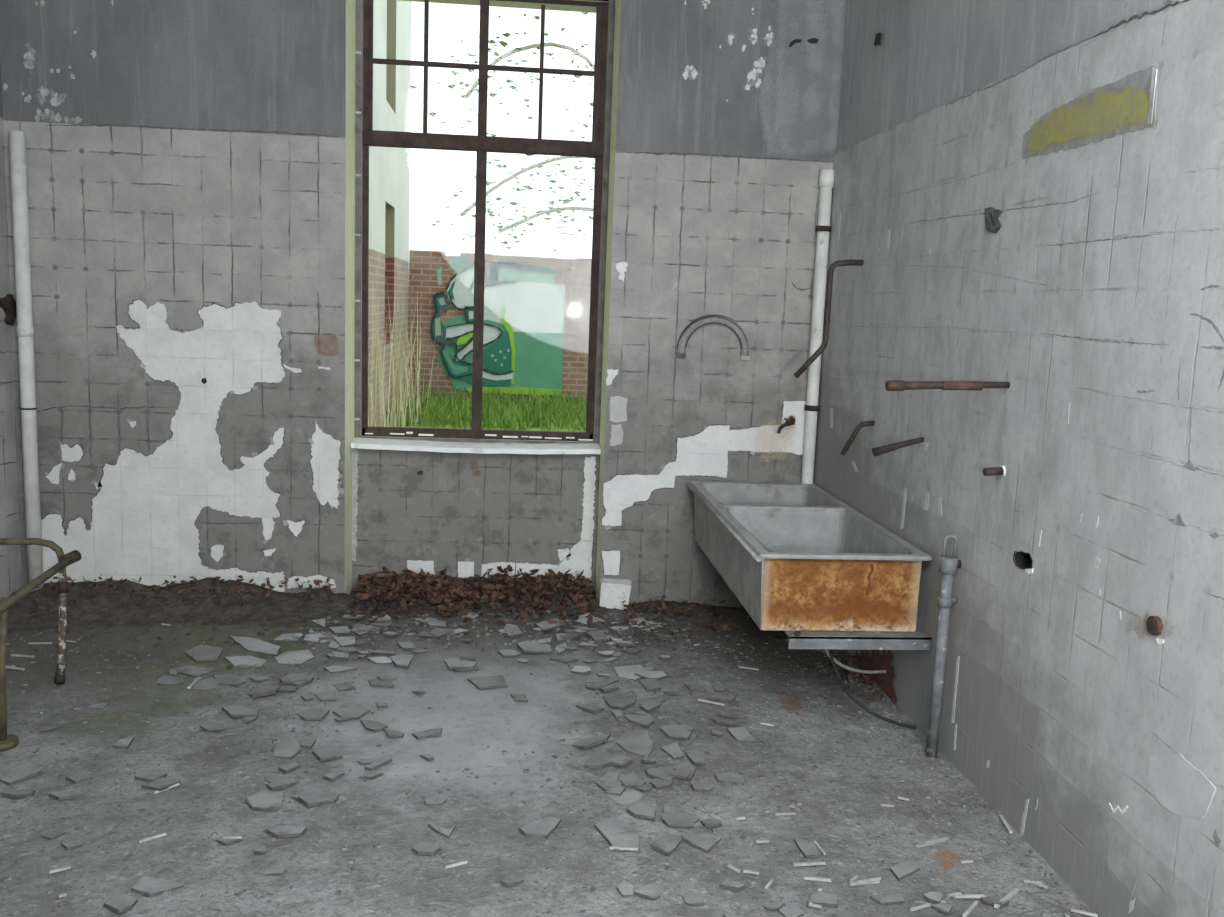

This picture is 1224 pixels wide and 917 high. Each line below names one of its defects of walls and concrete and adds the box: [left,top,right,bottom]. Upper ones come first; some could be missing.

crack [946,0,1189,105]
crack [912,192,1100,223]
crack [1047,228,1224,246]
peeling [41,298,337,592]
peeling [309,421,359,561]
peeling [606,369,627,446]
peeling [458,401,806,589]
crack [833,325,1224,477]